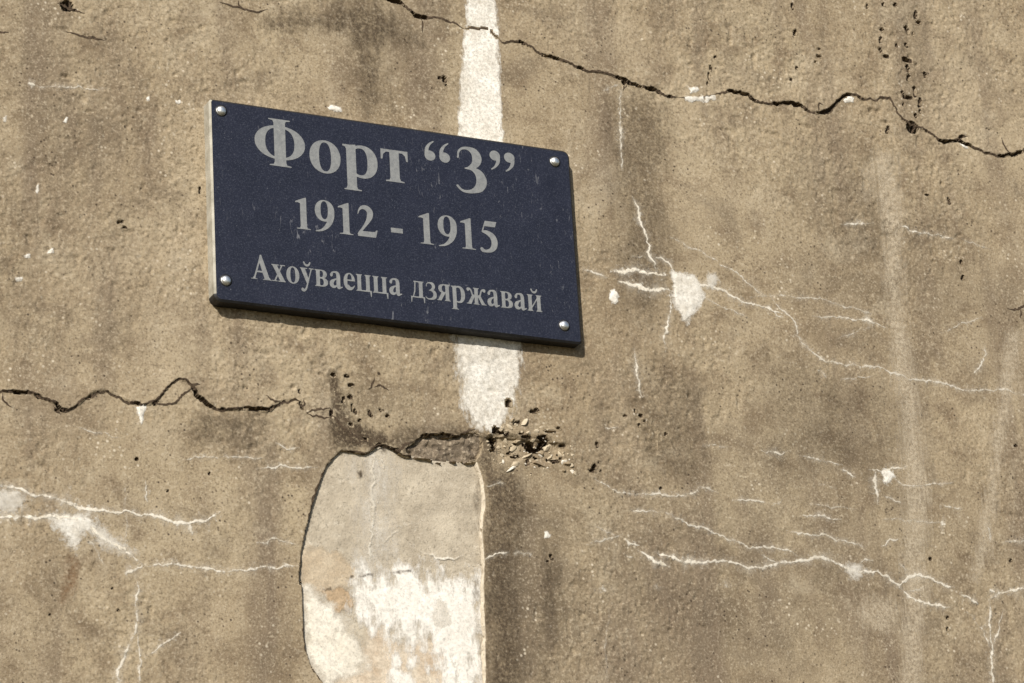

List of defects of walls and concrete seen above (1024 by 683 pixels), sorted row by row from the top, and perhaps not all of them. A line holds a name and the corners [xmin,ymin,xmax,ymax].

crack [387,0,1024,158]
efflorescence [672,272,717,320]
spalling [406,399,602,476]
crack [0,378,474,681]